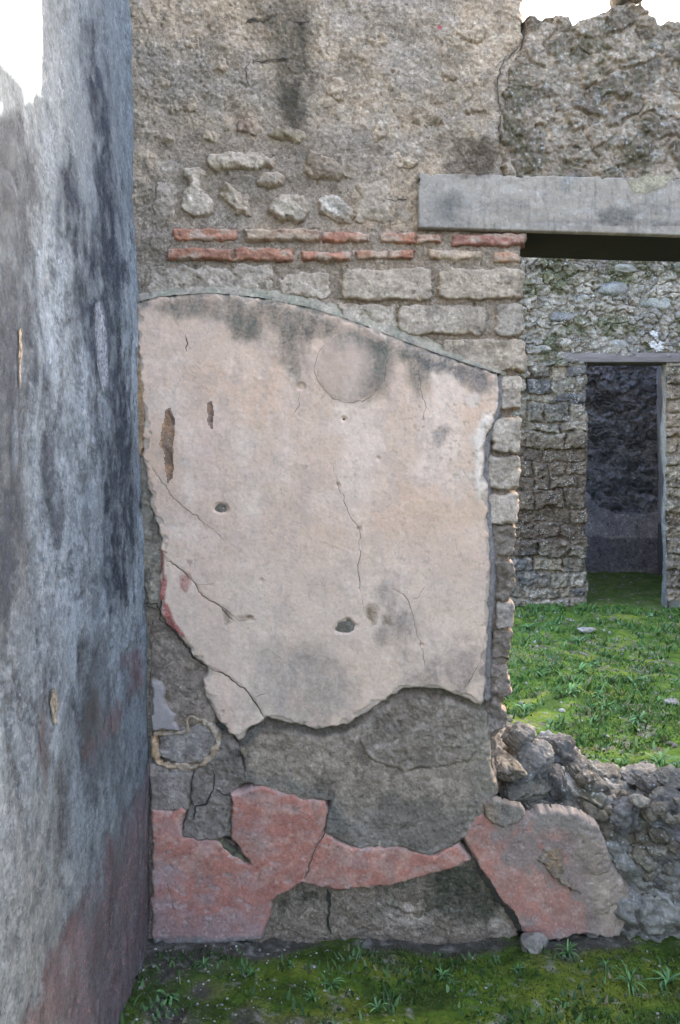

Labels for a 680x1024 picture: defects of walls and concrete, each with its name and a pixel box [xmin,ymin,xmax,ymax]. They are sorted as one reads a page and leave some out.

leakage [264,0,308,125]
crack [495,39,526,142]
leakage [163,300,334,373]
leakage [349,331,445,381]
leakage [159,408,175,483]
crack [168,561,244,623]
spalling [137,346,499,863]
crack [145,602,266,718]
crack [191,772,230,821]
crack [325,889,333,933]
spalling [374,880,464,939]
spalling [486,888,518,938]